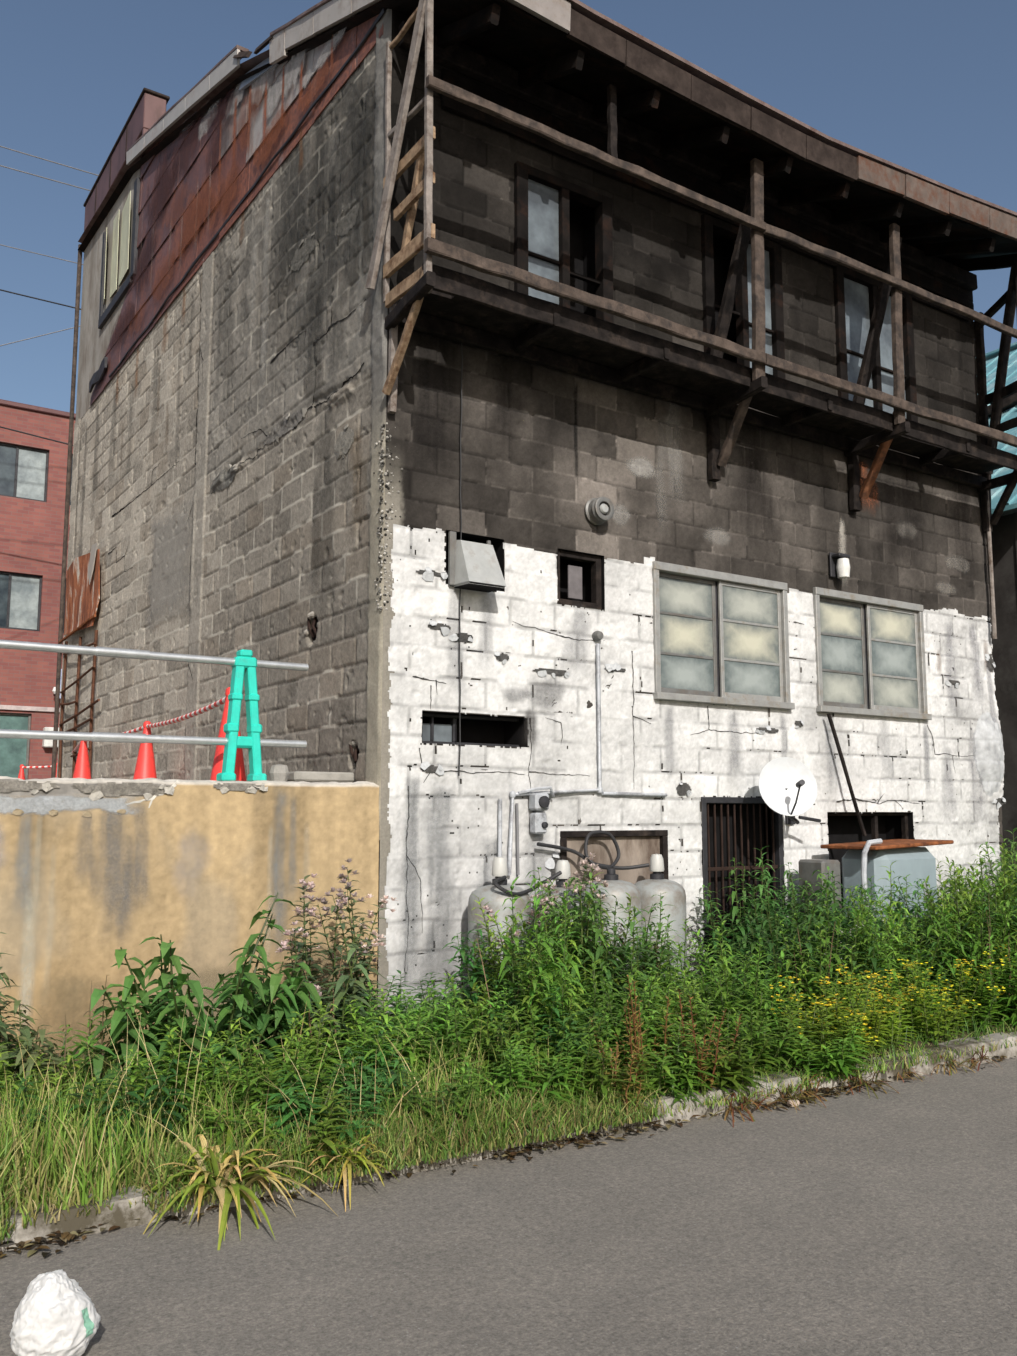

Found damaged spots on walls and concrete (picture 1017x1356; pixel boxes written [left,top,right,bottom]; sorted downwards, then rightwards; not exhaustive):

peeling [199,28,345,139]
rust [130,44,332,296]
crack [108,284,366,625]
crack [513,621,595,641]
crack [413,676,446,709]
crack [632,651,651,774]
crack [691,706,753,735]
peeling [0,779,175,817]
spalling [213,782,268,794]
crack [836,793,920,809]
crack [405,718,588,960]